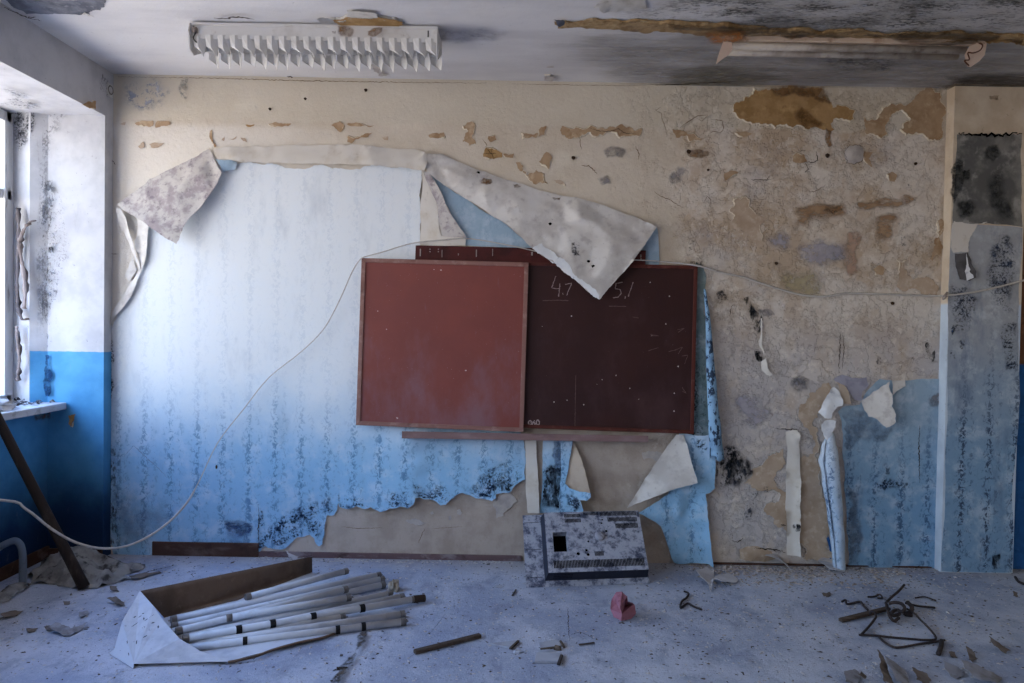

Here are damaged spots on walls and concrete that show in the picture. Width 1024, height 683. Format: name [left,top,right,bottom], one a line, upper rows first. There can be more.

peeling [554,0,1024,46]
leakage [595,0,1024,147]
mould [5,90,36,147]
peeling [733,85,947,141]
peeling [462,121,566,186]
mould [951,160,974,217]
mould [37,181,66,316]
mould [950,287,975,358]
mould [1001,323,1016,369]
mould [716,446,753,485]
peeling [798,383,832,561]
leakage [225,499,363,548]